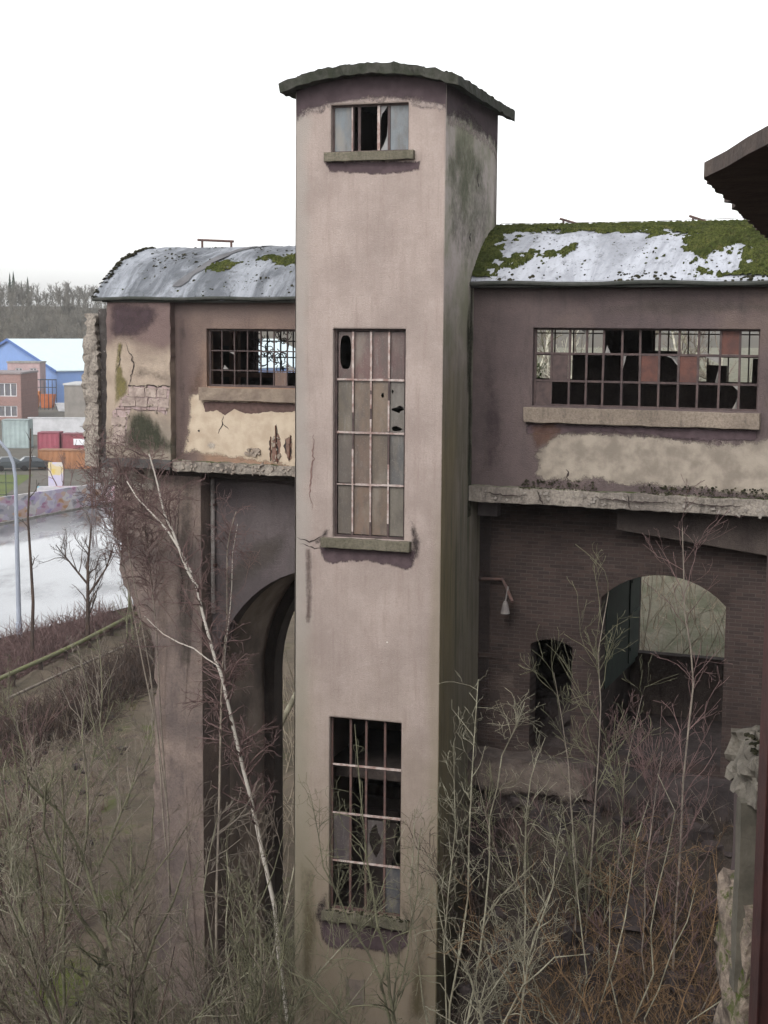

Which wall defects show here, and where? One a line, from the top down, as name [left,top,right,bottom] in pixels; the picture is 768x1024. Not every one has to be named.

leakage [112,305,154,335]
crack [115,344,170,387]
peeling [174,394,295,477]
peeling [535,432,768,519]
leakage [307,528,418,617]
leakage [317,900,408,957]